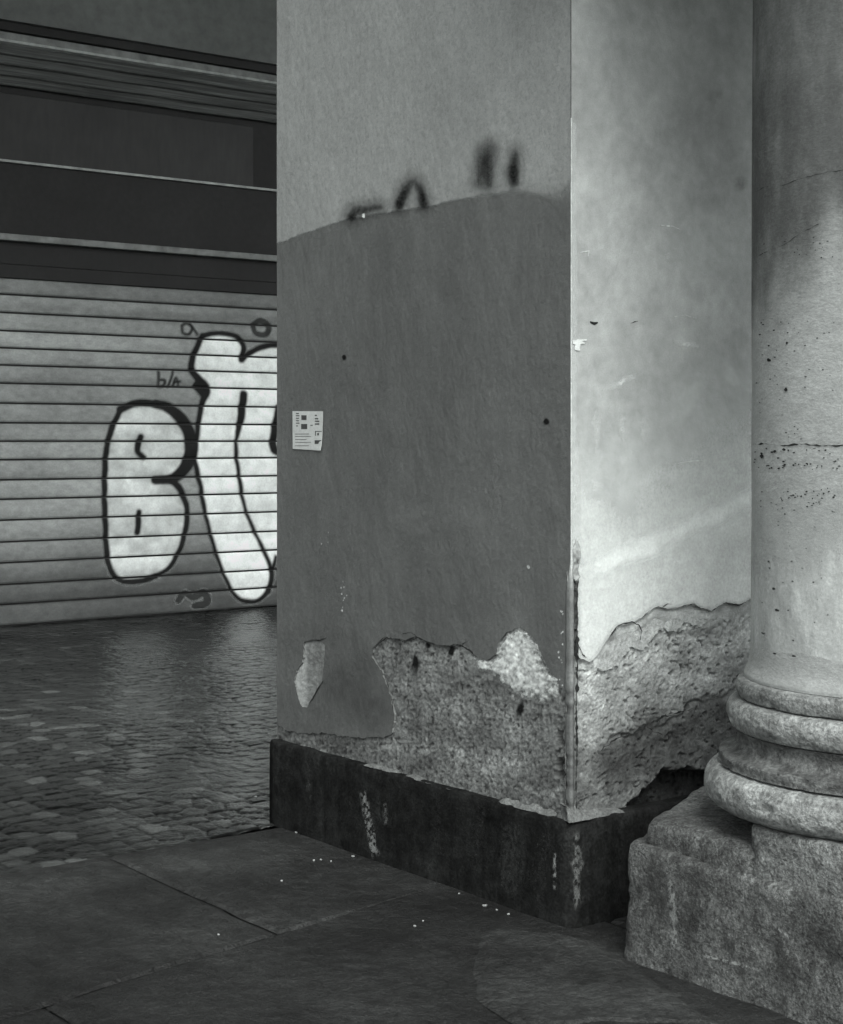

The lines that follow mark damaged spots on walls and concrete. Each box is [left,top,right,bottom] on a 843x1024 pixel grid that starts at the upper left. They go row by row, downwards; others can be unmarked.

crack [758,441,843,449]
spalling [278,600,755,874]